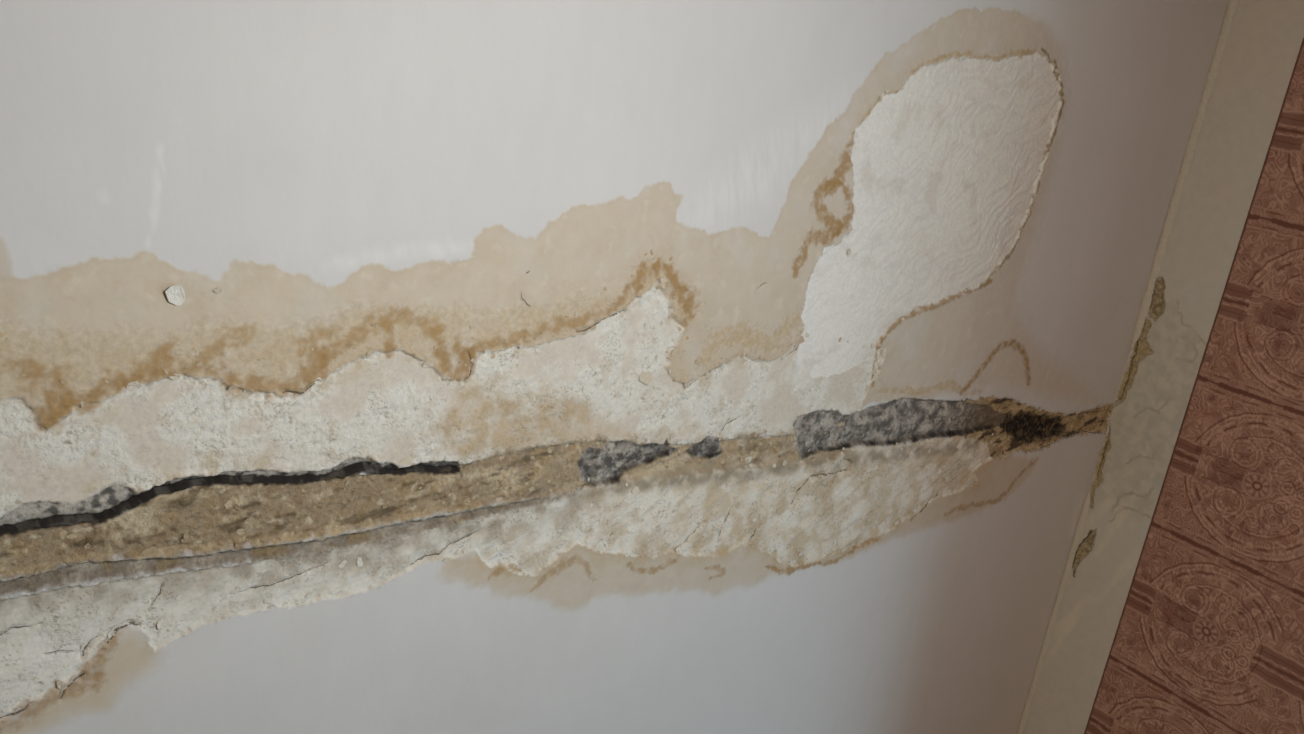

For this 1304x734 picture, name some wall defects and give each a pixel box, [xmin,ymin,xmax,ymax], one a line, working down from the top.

crack [282,380,318,395]
flaking render [0,45,1066,715]
leakage [0,4,1215,616]
flaking render [1113,275,1167,408]
crack [0,454,463,539]
crack [410,530,480,566]
crack [674,506,756,552]
crack [791,458,852,504]
flaking render [1071,528,1098,579]
flaking render [1089,429,1112,511]